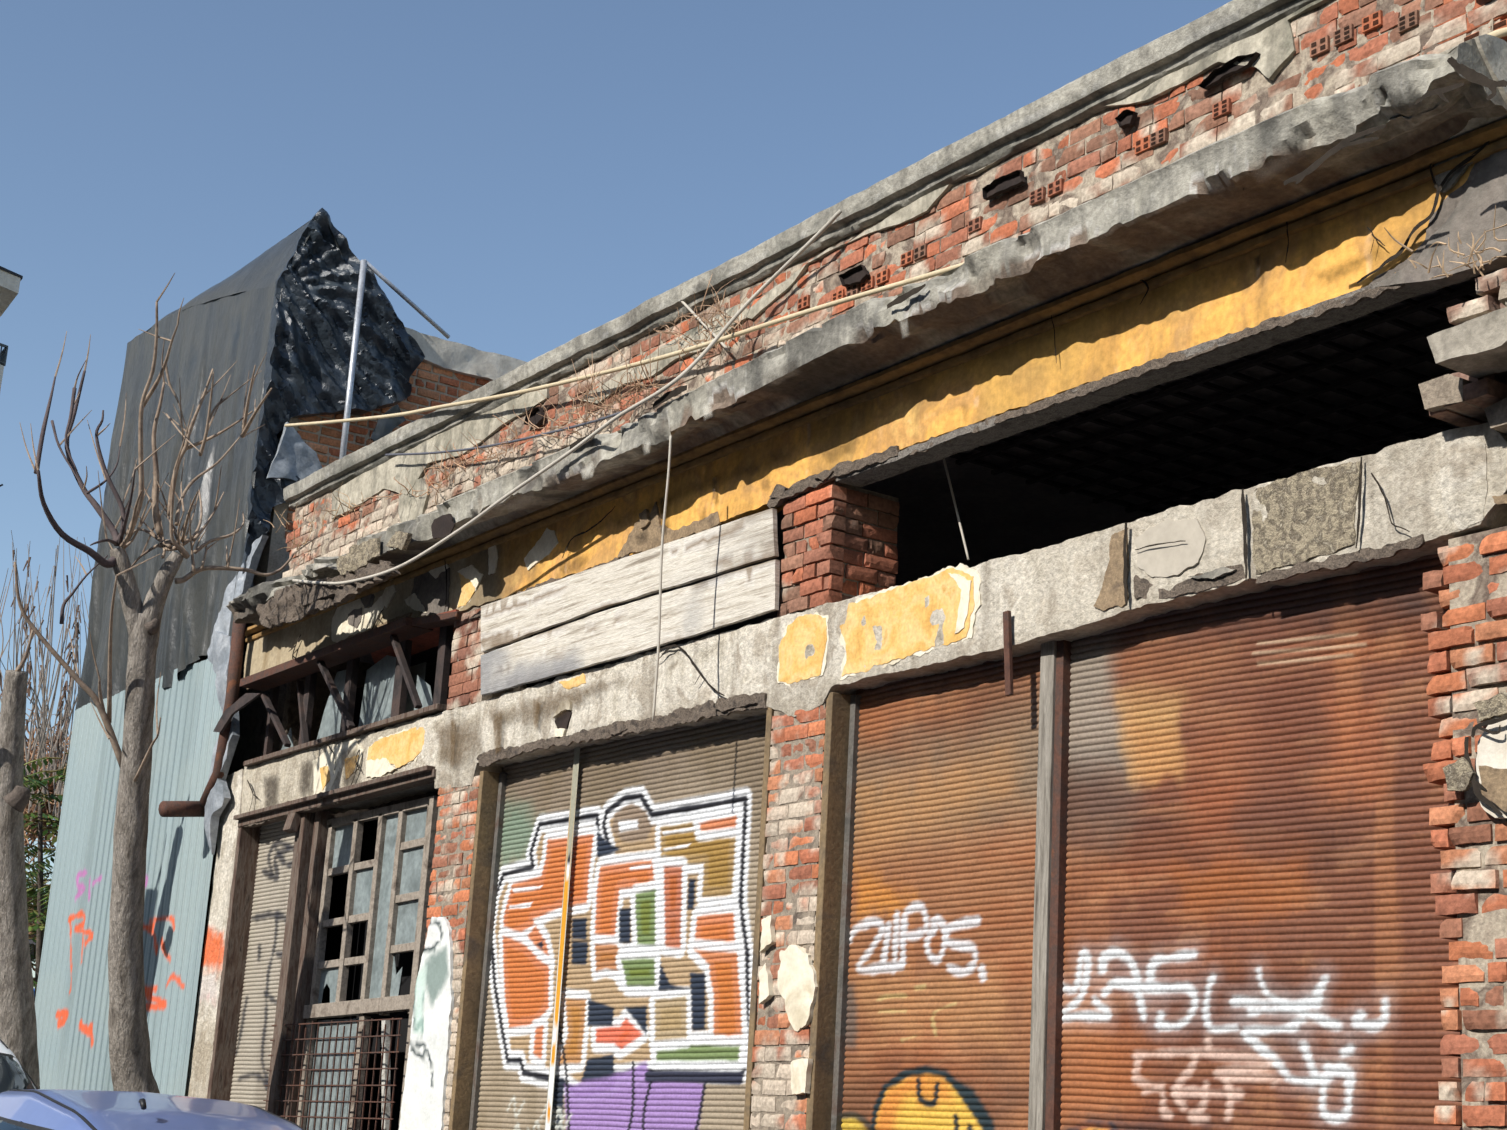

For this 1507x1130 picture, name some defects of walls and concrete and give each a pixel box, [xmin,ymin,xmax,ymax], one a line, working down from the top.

spalling [1115,109,1138,129]
spalling [1198,52,1260,90]
crack [1284,56,1507,185]
crack [1357,141,1489,284]
spalling [767,144,1507,509]
spalling [524,408,546,426]
peeling [477,563,982,767]
peeling [244,727,425,827]
spalling [1443,757,1507,812]
flaking render [759,915,818,1032]
flaking render [791,1058,813,1095]